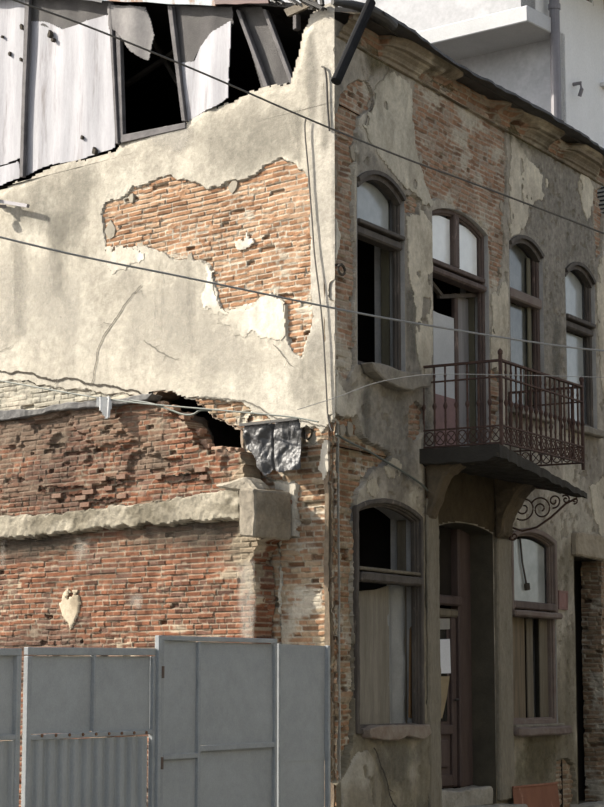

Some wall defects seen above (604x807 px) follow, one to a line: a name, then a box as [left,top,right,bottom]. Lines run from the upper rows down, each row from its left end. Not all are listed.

spalling [103,159,313,356]
crack [0,285,144,394]
spalling [0,380,130,410]
spalling [149,390,275,453]
spalling [260,71,548,807]
spalling [38,474,129,508]
spalling [155,467,210,484]
flaking render [59,589,82,630]